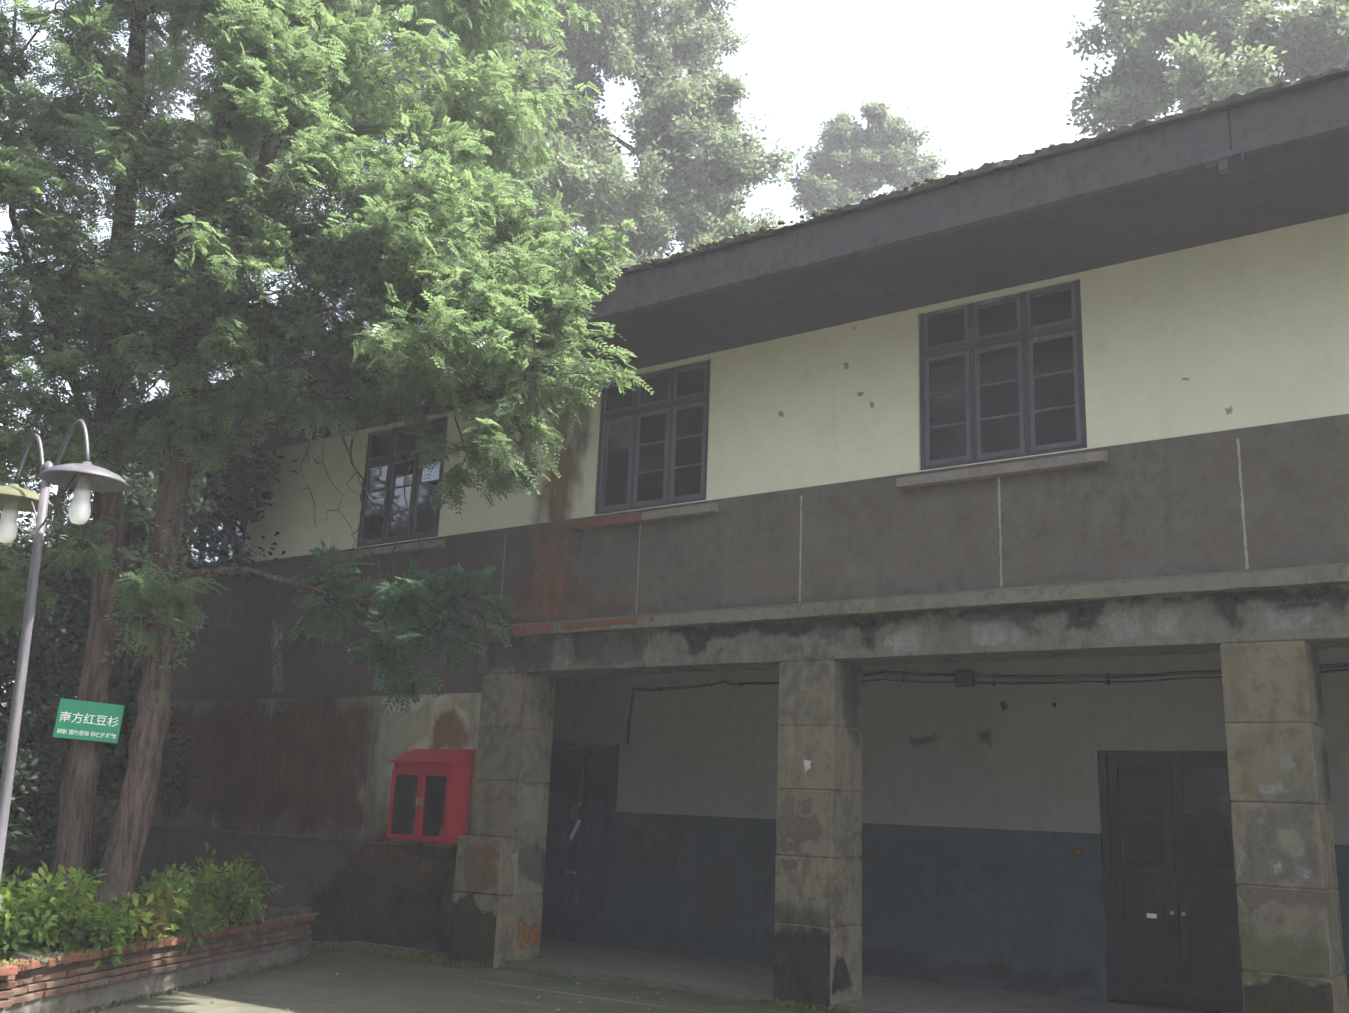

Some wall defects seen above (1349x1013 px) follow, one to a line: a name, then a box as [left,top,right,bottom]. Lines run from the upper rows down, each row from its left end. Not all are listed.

damp [647,598,1144,664]
damp [1158,586,1349,636]
corrosion [431,710,469,749]
damp [307,831,457,949]
damp [773,904,1090,1008]
damp [1244,973,1334,1013]